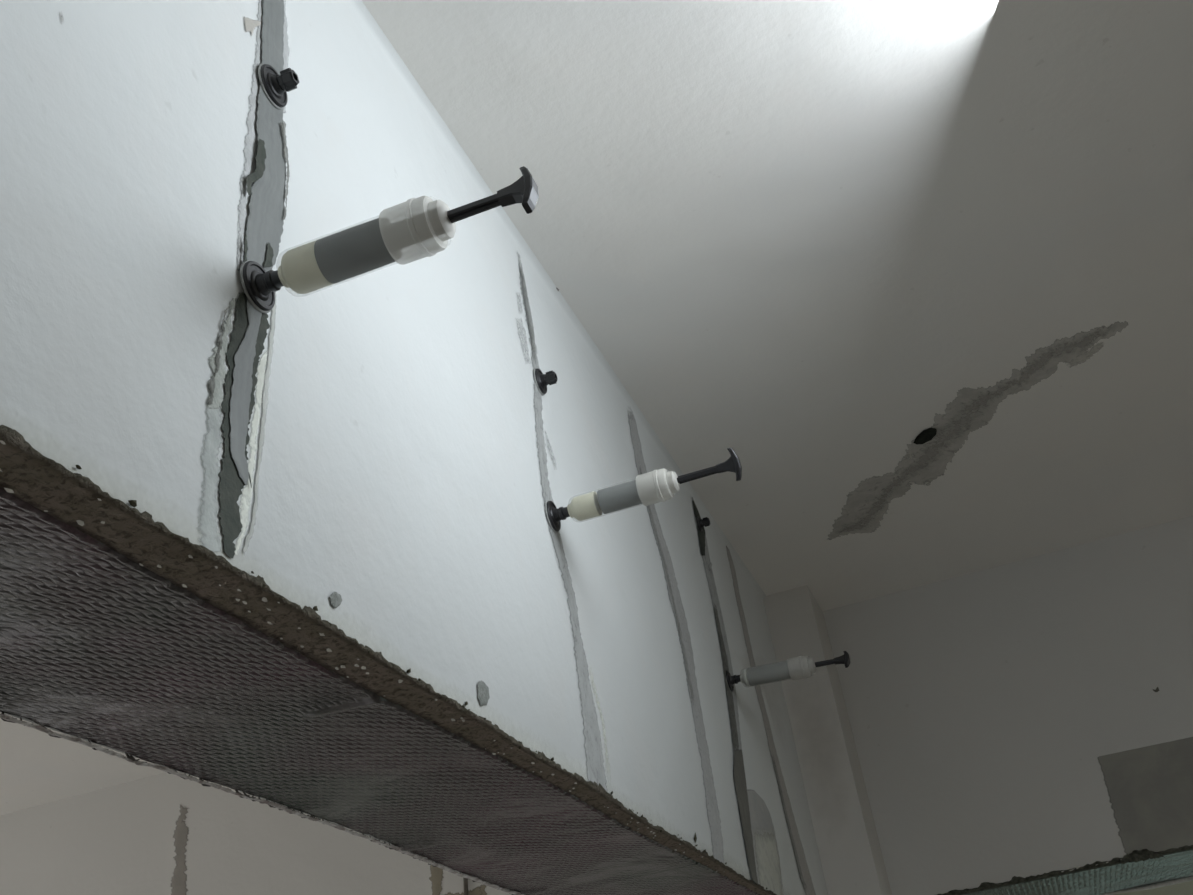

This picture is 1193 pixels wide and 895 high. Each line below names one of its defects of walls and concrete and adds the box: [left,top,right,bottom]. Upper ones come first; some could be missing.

crack [199,0,290,558]
spalling [0,425,777,895]
crack [518,255,607,791]
crack [628,414,647,475]
crack [647,498,816,895]